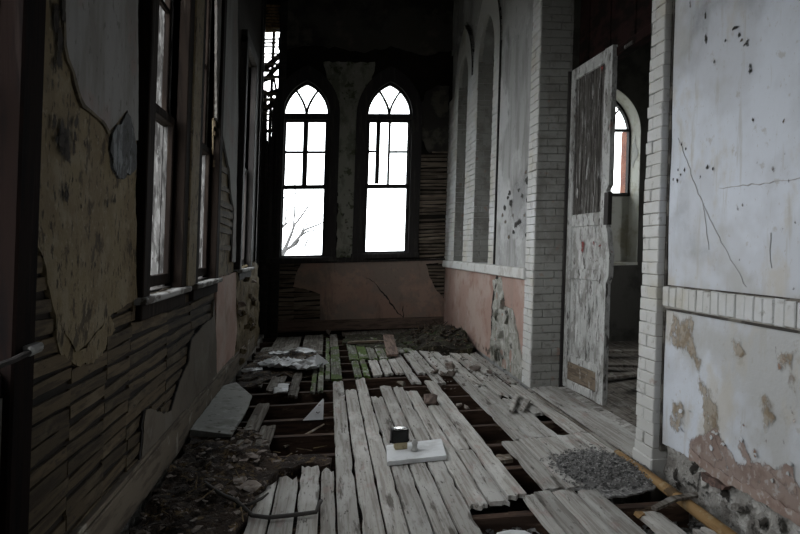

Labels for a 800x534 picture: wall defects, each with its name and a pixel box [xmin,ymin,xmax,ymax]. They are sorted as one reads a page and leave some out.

flaking render [28,0,214,534]
spalling [212,118,260,365]
flaking render [419,151,448,298]
spalling [490,277,525,383]
crack [678,138,746,287]
crack [721,178,800,189]
crack [766,233,774,268]
flaking render [670,315,800,534]